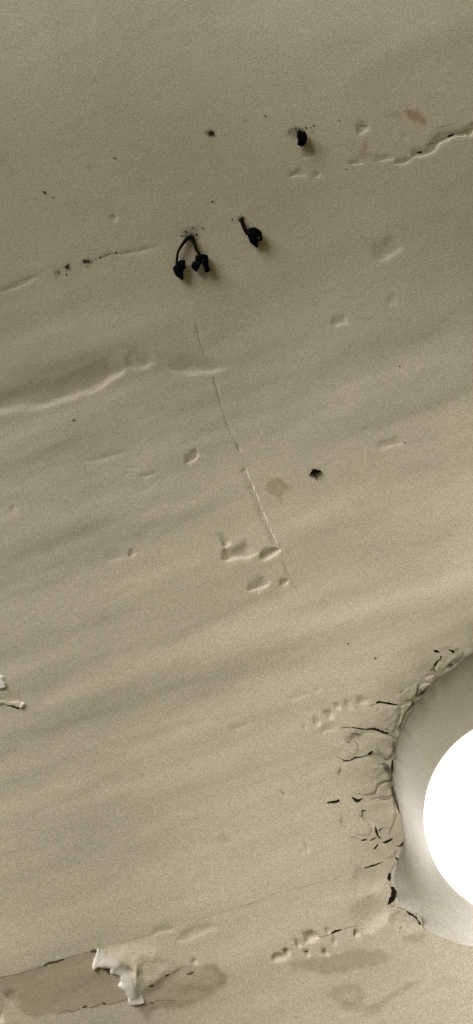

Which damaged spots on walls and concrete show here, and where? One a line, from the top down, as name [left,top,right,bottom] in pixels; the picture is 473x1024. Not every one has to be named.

crack [211,374,295,586]
crack [327,649,463,925]
flaking render [92,937,190,1006]